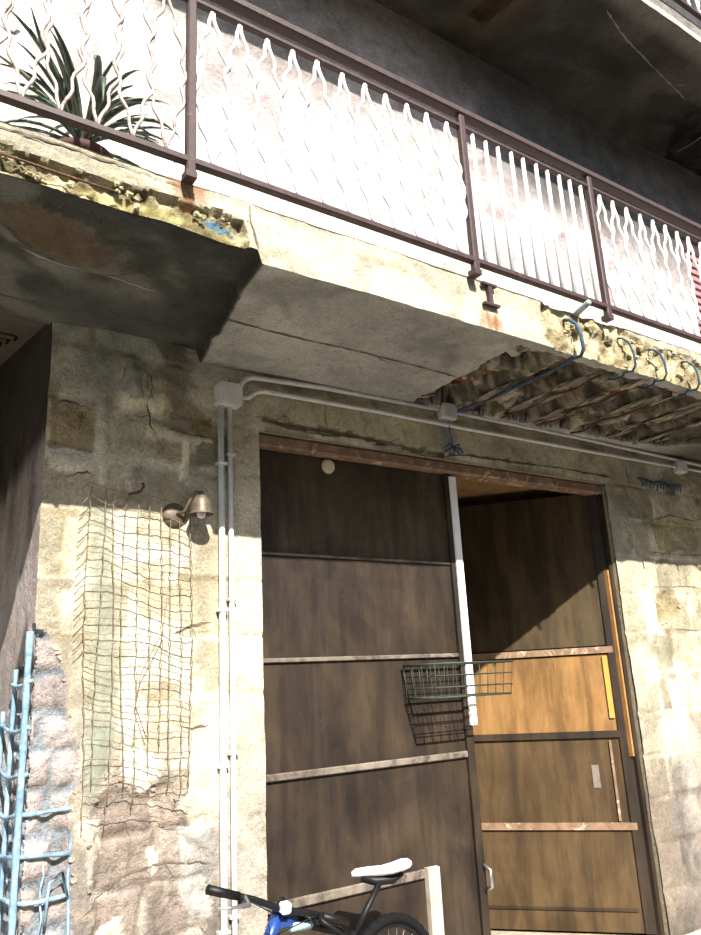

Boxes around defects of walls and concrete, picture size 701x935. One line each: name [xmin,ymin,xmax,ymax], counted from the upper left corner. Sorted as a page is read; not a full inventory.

crack [607,11,686,99]
crack [221,305,455,377]
spalling [540,301,701,392]
crack [122,360,209,438]
spalling [0,623,89,935]
crack [83,822,209,917]
spalling [86,766,208,935]